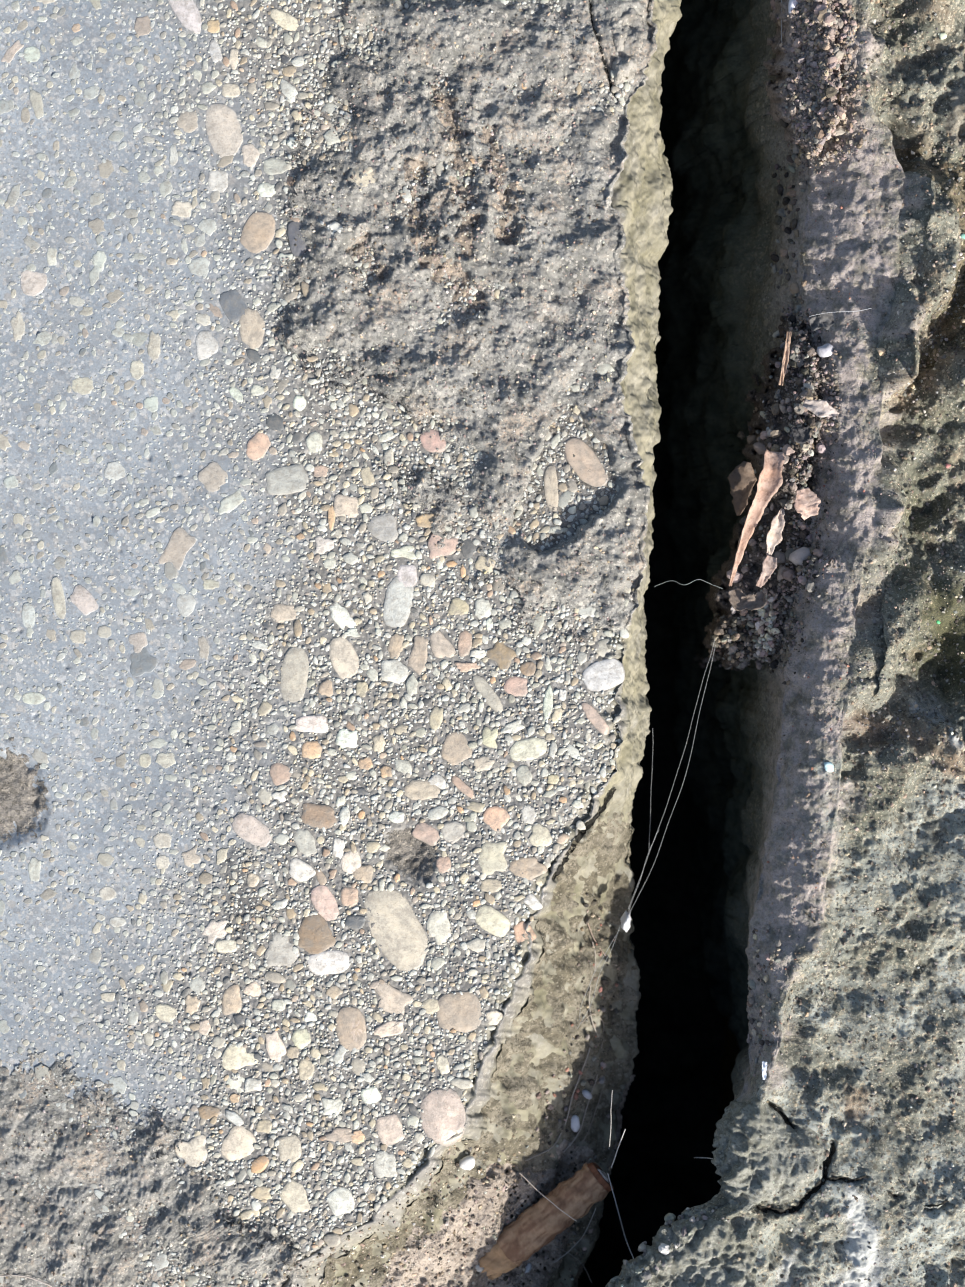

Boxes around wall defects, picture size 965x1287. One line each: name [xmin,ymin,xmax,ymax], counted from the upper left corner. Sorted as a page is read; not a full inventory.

crack [589,0,618,101]
spalling [273,0,658,644]
crack [554,469,725,1287]
spalling [0,1047,306,1287]
crack [769,1103,797,1132]
crack [756,1142,949,1214]